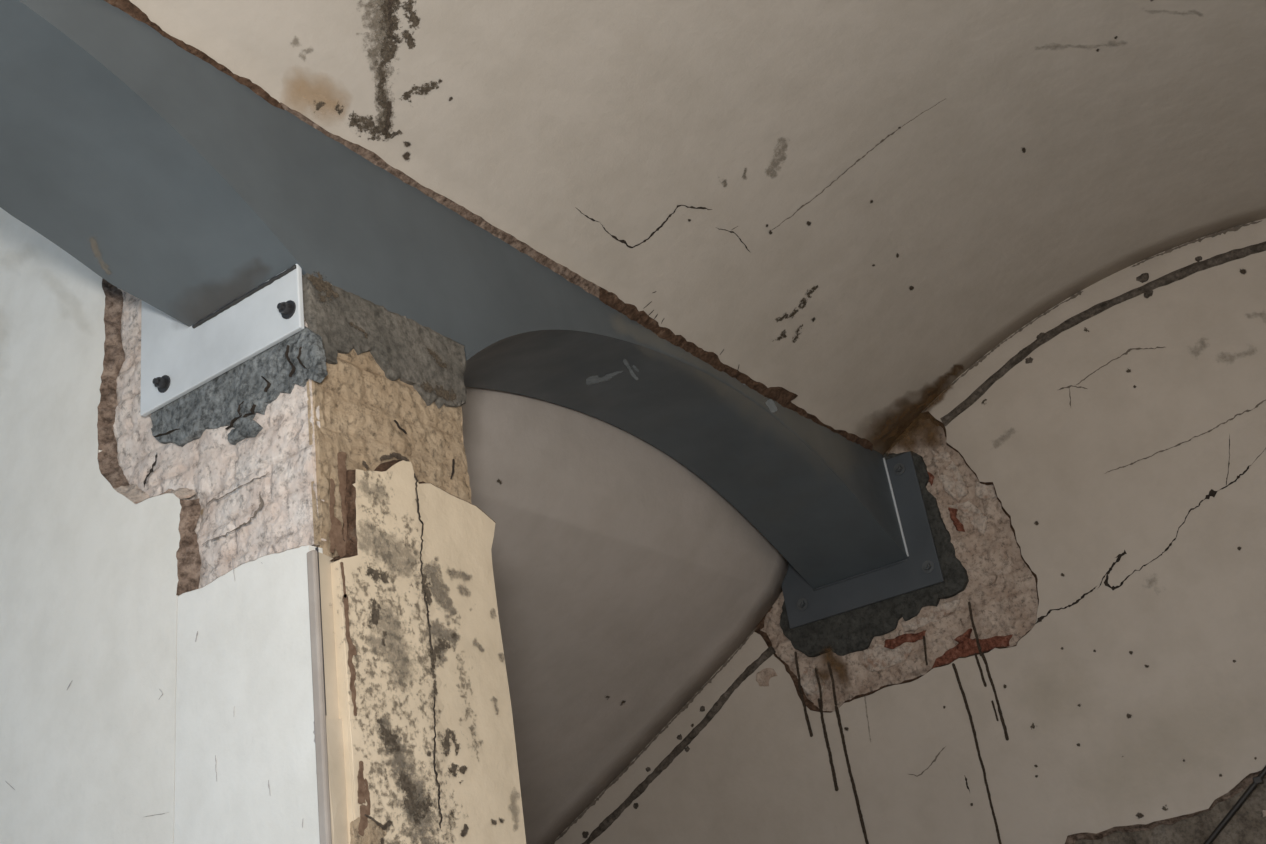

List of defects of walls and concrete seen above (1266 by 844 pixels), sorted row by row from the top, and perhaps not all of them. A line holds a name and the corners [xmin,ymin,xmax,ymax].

leakage [316,0,442,160]
crack [575,205,751,253]
spalling [97,0,1039,716]
rust [866,365,963,453]
leakage [341,463,482,844]
crack [414,473,434,662]
crack [433,697,443,828]
leakage [794,651,869,844]
leakage [952,663,1002,844]
leakage [968,602,1009,741]
crack [1035,400,1266,624]
spalling [1065,770,1266,844]